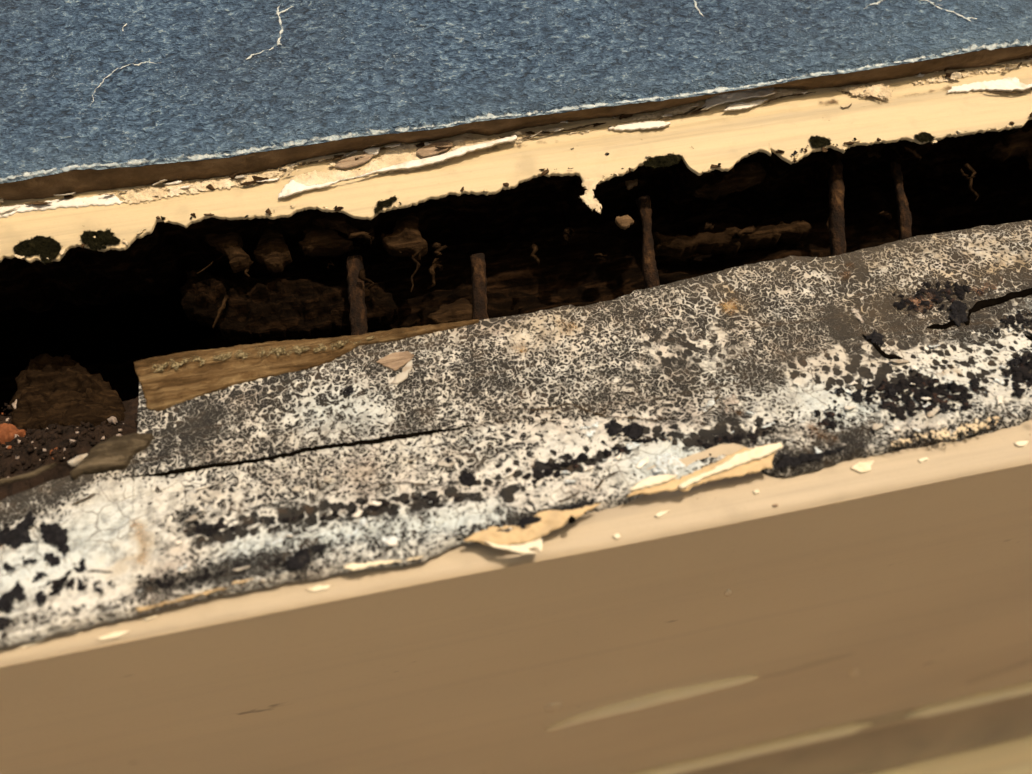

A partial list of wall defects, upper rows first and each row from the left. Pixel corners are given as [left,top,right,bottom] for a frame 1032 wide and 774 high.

leakage [371,96,663,135]
leakage [188,133,355,160]
peeling [0,85,778,218]
spalling [844,167,1032,253]
spalling [363,168,831,333]
crack [121,403,675,477]
mould [604,420,645,440]
crack [71,493,97,505]
crack [374,481,426,491]
crack [558,470,623,502]
peeling [562,442,783,497]
mould [0,510,115,630]